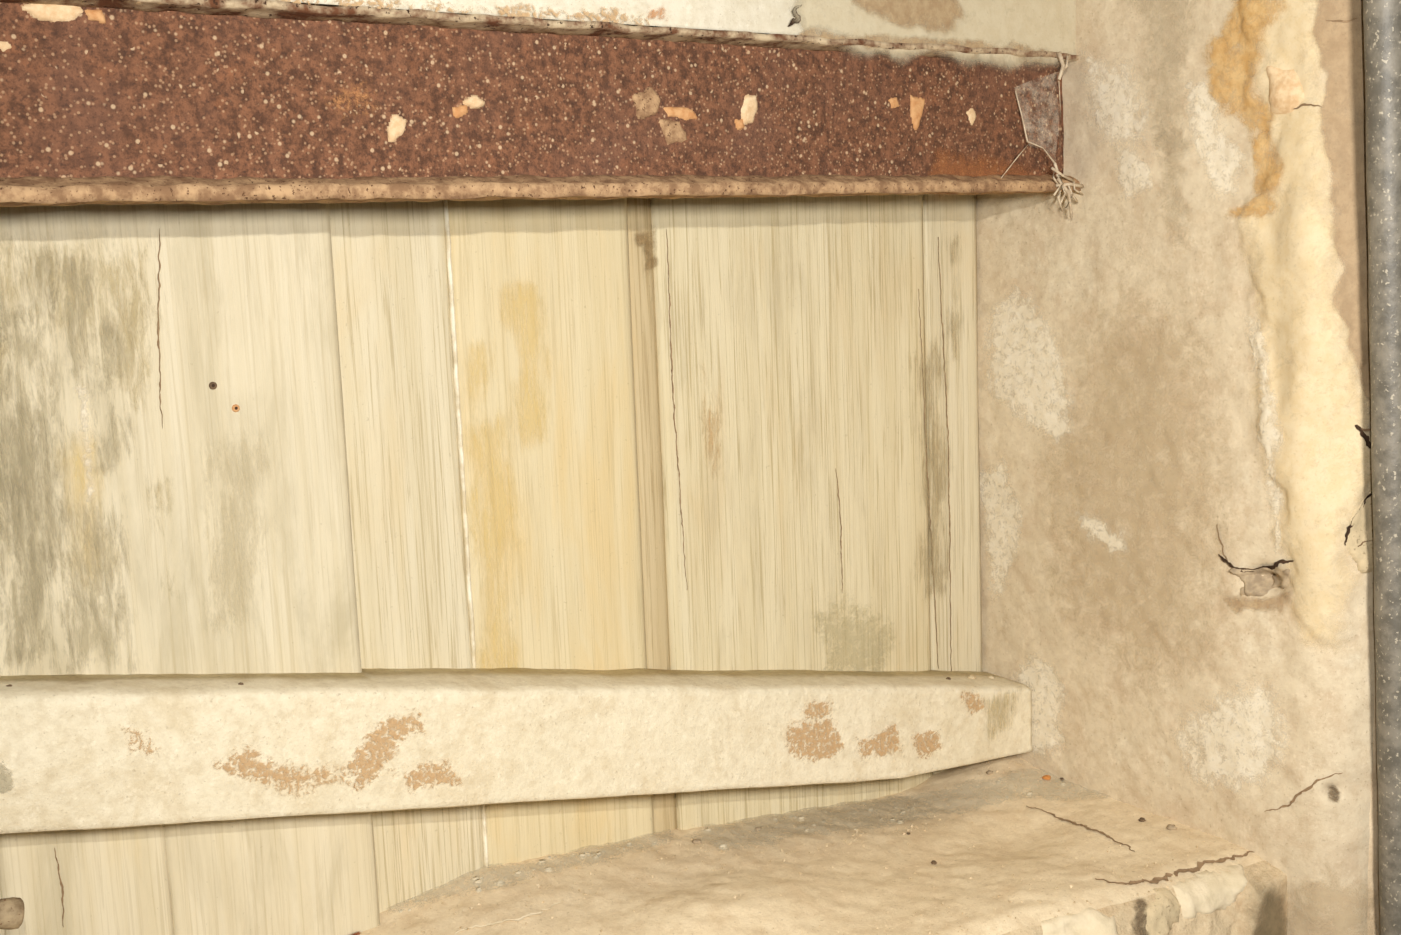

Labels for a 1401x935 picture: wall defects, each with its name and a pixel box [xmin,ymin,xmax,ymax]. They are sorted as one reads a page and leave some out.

damp [1187,0,1282,216]
mould [0,374,63,657]
peeling [0,762,13,793]
crack [1266,773,1342,811]
crack [1026,805,1253,885]